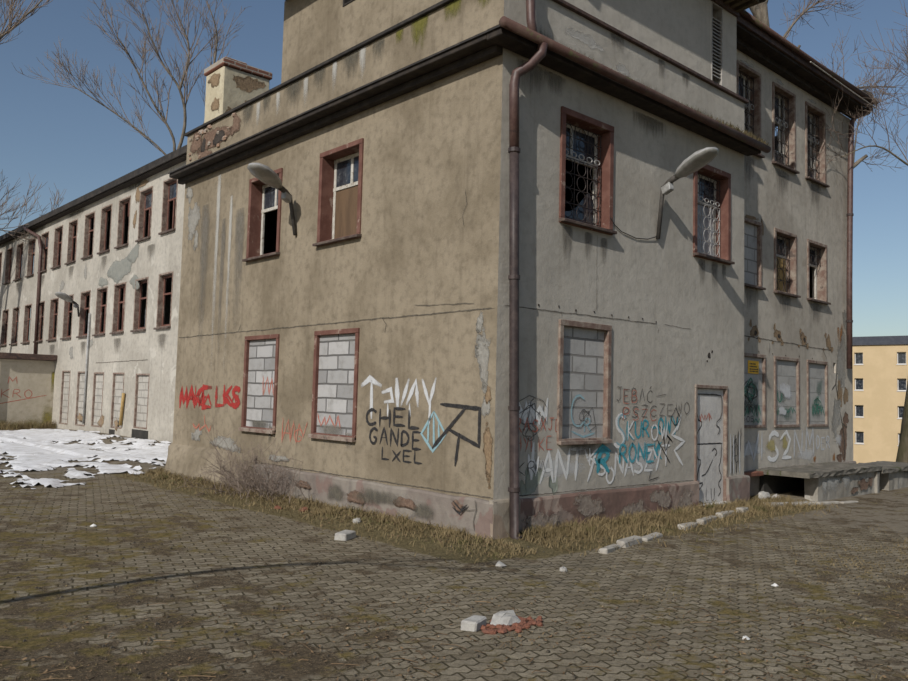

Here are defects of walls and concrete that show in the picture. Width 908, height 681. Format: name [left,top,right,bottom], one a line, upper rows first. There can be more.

flaking render [188,73,241,161]
flaking render [233,75,266,102]
flaking render [748,320,761,342]
peeling [823,310,849,462]